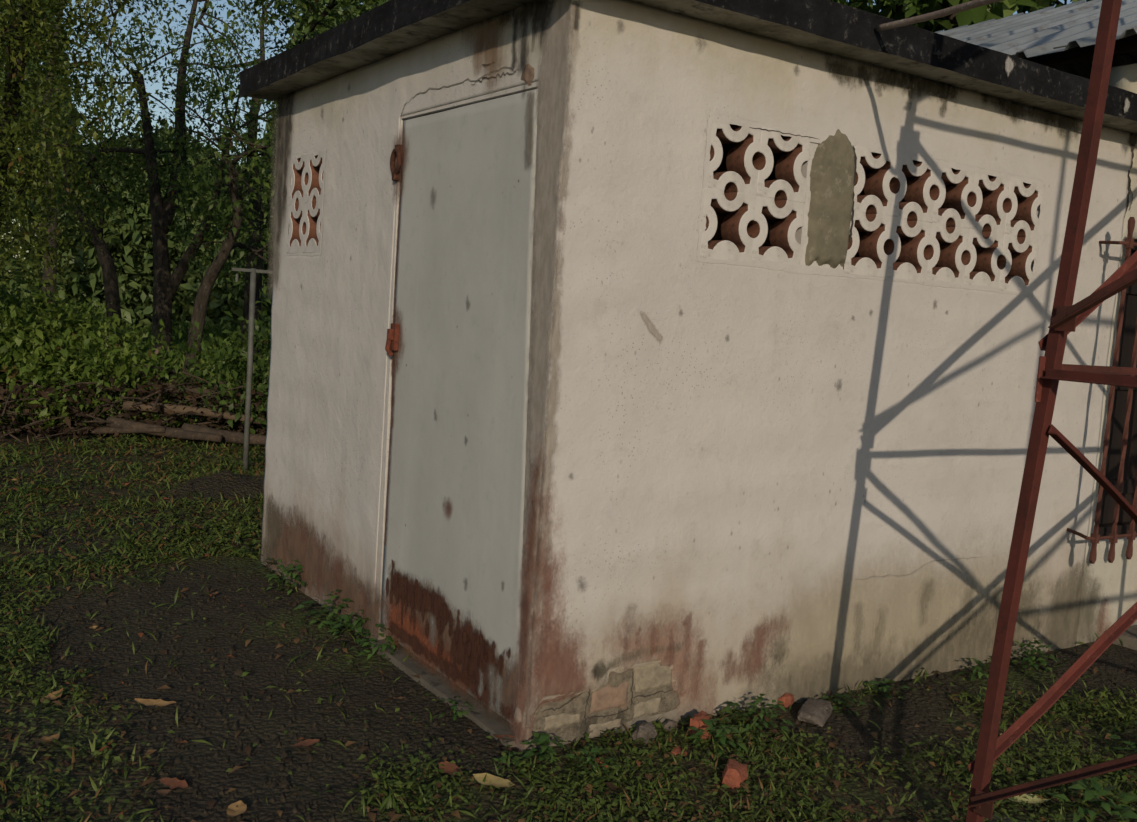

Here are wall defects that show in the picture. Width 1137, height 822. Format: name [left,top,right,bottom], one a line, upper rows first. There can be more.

leakage [475,0,553,71]
leakage [827,57,958,112]
leakage [982,93,1078,135]
corrosion [265,468,540,742]
leakage [777,596,999,703]
leakage [1010,576,1098,659]
spalling [530,647,680,749]